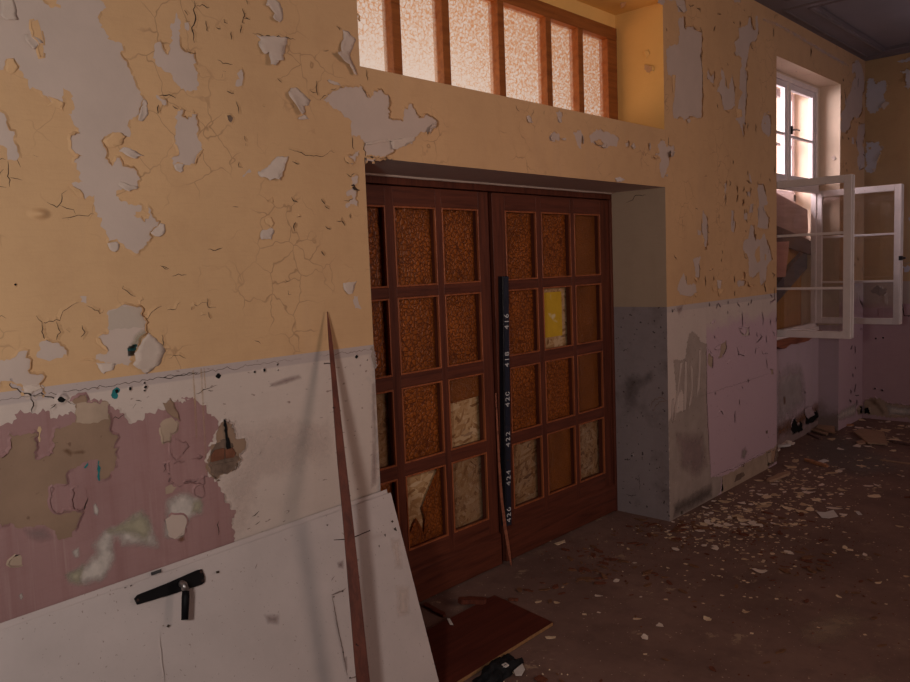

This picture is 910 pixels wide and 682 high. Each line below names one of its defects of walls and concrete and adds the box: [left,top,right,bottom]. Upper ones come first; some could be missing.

peeling [0,0,204,256]
crack [157,91,195,114]
peeling [243,156,289,180]
peeling [253,33,293,65]
peeling [288,30,439,208]
peeling [657,0,759,137]
peeling [840,56,910,173]
crack [321,198,352,255]
peeling [731,173,773,287]
crack [9,378,74,413]
hole [204,418,248,482]
peeling [668,331,779,521]